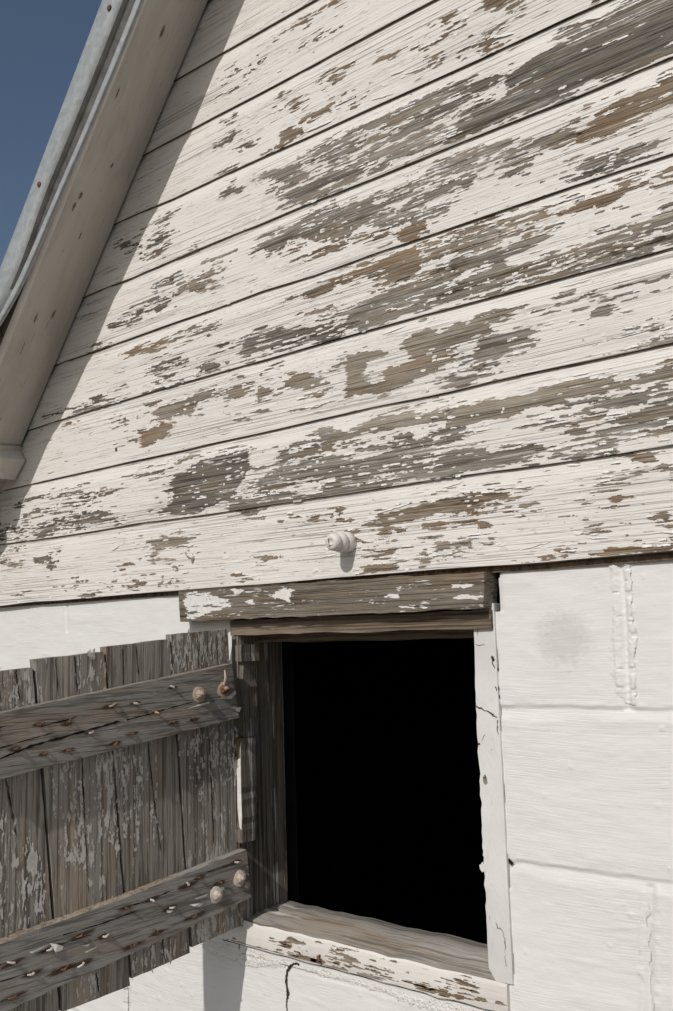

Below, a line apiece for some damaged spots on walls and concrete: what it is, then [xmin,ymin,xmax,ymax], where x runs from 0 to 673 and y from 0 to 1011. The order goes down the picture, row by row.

peeling [0,0,673,675]
peeling [190,691,241,712]
peeling [178,725,238,802]
peeling [51,742,163,873]
peeling [0,811,46,933]
corrosion [178,875,224,890]
corrosion [23,958,92,978]
corrosion [38,929,107,953]
crack [285,962,299,1011]
peeling [132,907,507,1011]